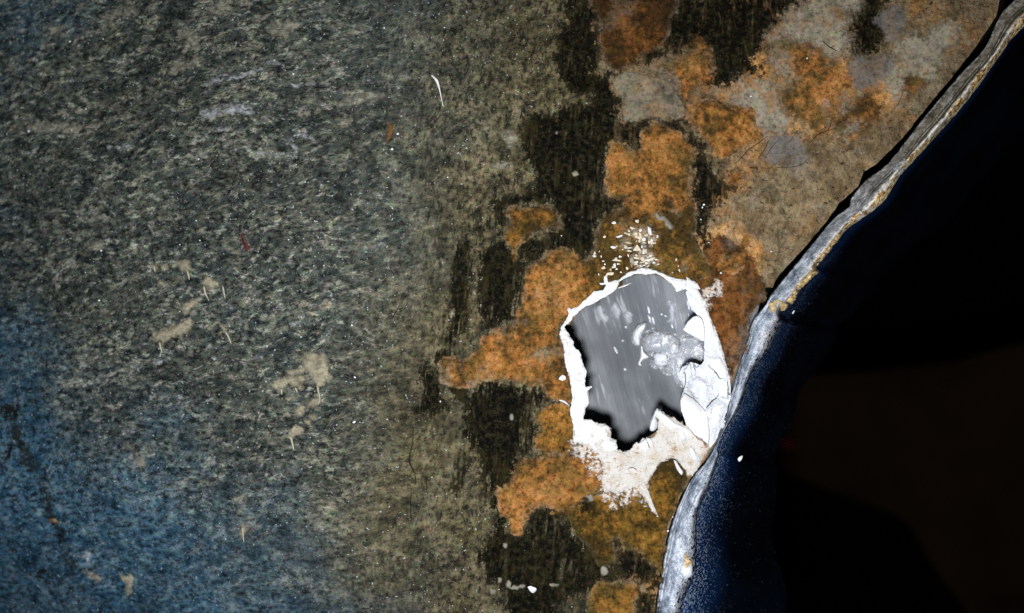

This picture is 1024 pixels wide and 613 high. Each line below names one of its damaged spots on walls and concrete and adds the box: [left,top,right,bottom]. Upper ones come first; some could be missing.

rust [763,38,882,150]
rust [902,74,928,101]
damp [400,200,558,613]
damp [579,497,601,514]
rust [437,0,766,613]
spalling [559,220,728,517]